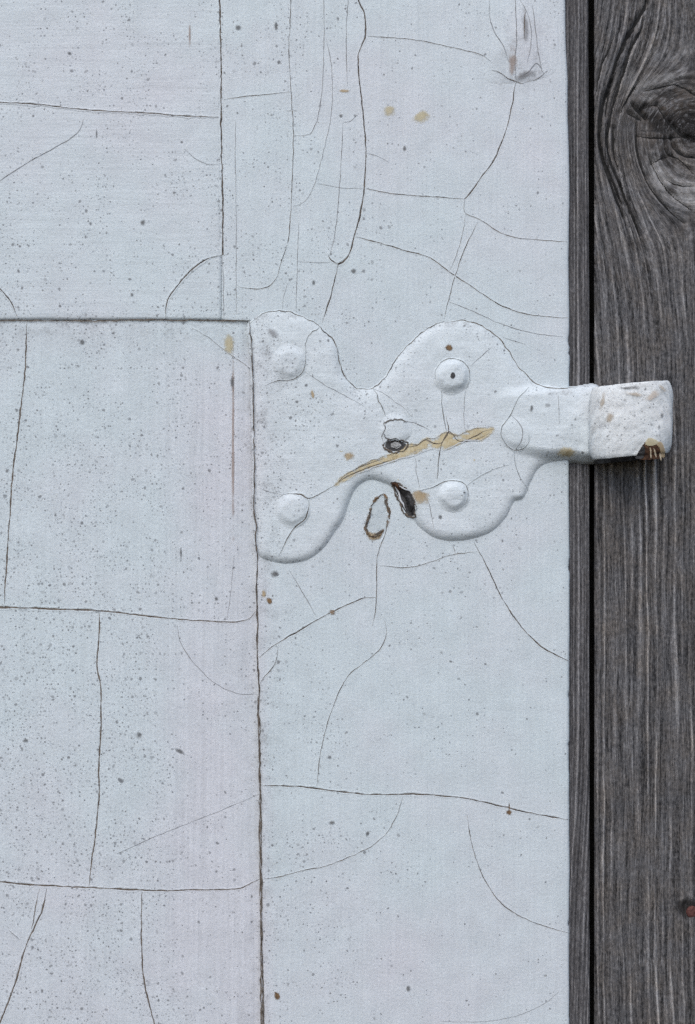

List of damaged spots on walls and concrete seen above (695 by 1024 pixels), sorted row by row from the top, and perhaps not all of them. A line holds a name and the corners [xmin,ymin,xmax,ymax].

crack [0,0,333,322]
crack [246,0,577,416]
peeling [336,417,494,485]
crack [0,322,569,1024]